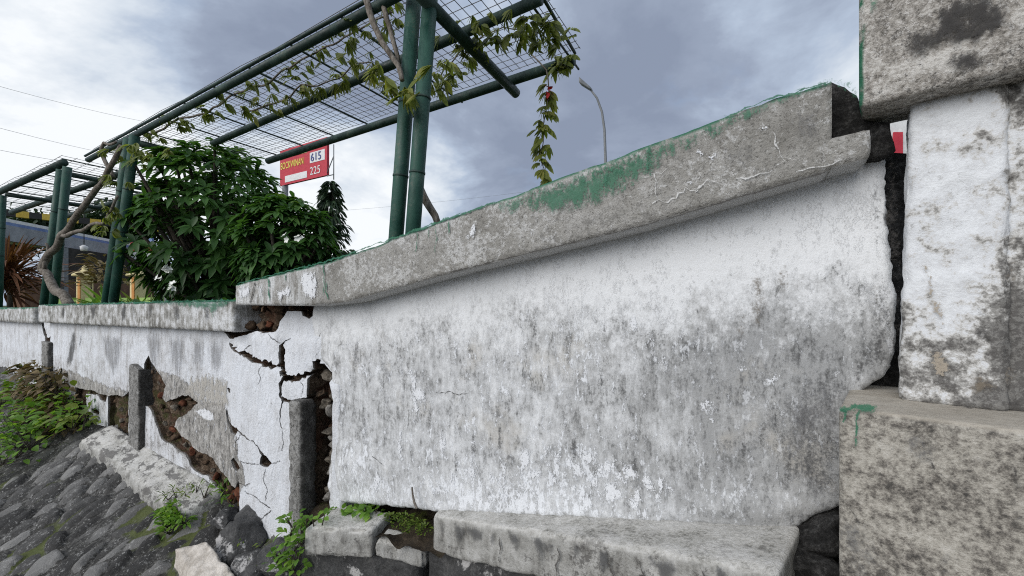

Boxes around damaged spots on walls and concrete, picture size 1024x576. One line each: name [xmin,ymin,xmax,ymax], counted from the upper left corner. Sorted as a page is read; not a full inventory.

spalling [224,270,317,339]
crack [449,134,842,273]
crack [870,153,907,387]
spalling [57,367,129,434]
spalling [144,356,245,506]
crack [226,333,328,519]
spalling [307,365,333,505]